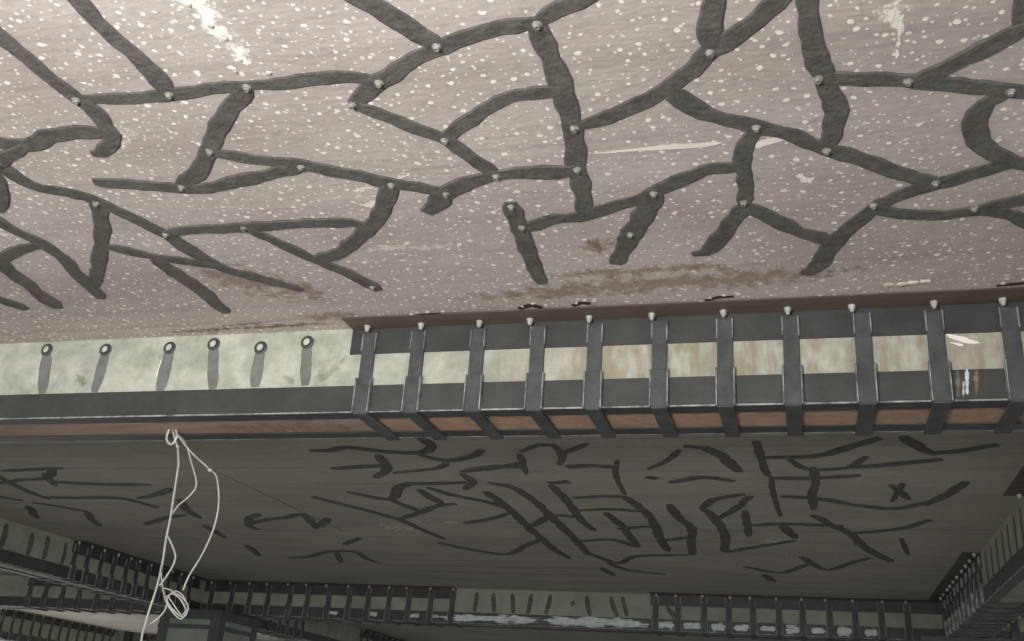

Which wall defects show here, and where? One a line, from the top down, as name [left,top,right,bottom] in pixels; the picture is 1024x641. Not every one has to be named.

water stain [878,0,914,59]
crack [0,436,1000,617]
water stain [544,616,649,628]